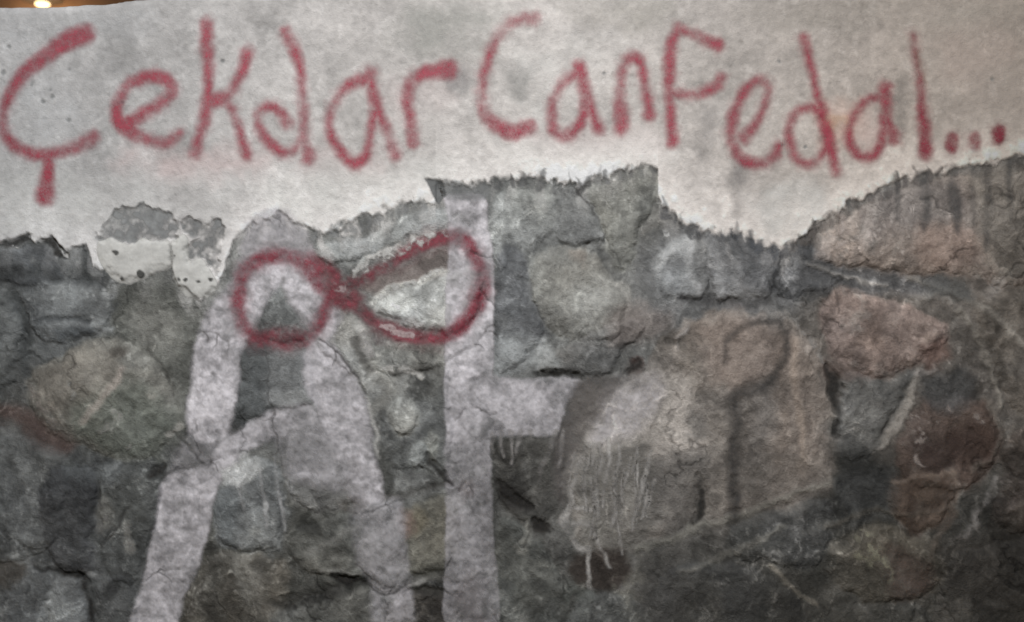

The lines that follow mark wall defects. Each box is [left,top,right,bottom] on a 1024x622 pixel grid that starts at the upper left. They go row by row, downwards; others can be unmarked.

spalling [442,182,488,199]
peeling [97,203,224,298]
peeling [380,324,415,338]
leakage [555,379,620,588]
leakage [623,451,651,525]